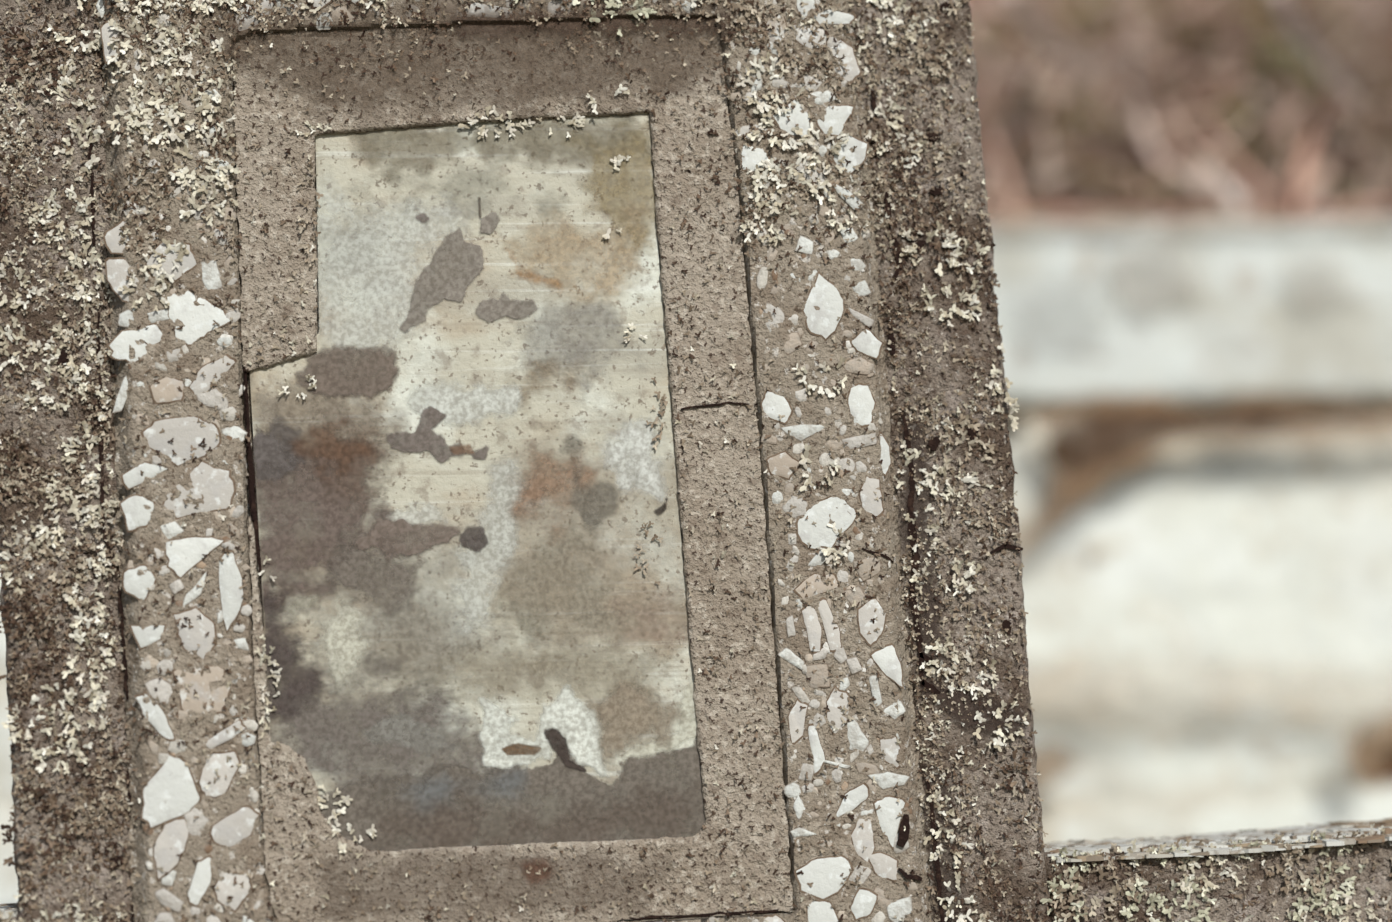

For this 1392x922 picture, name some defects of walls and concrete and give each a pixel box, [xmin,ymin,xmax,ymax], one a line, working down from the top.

leakage [225,0,729,107]
leakage [327,208,437,349]
leakage [351,115,654,424]
leakage [253,393,697,790]